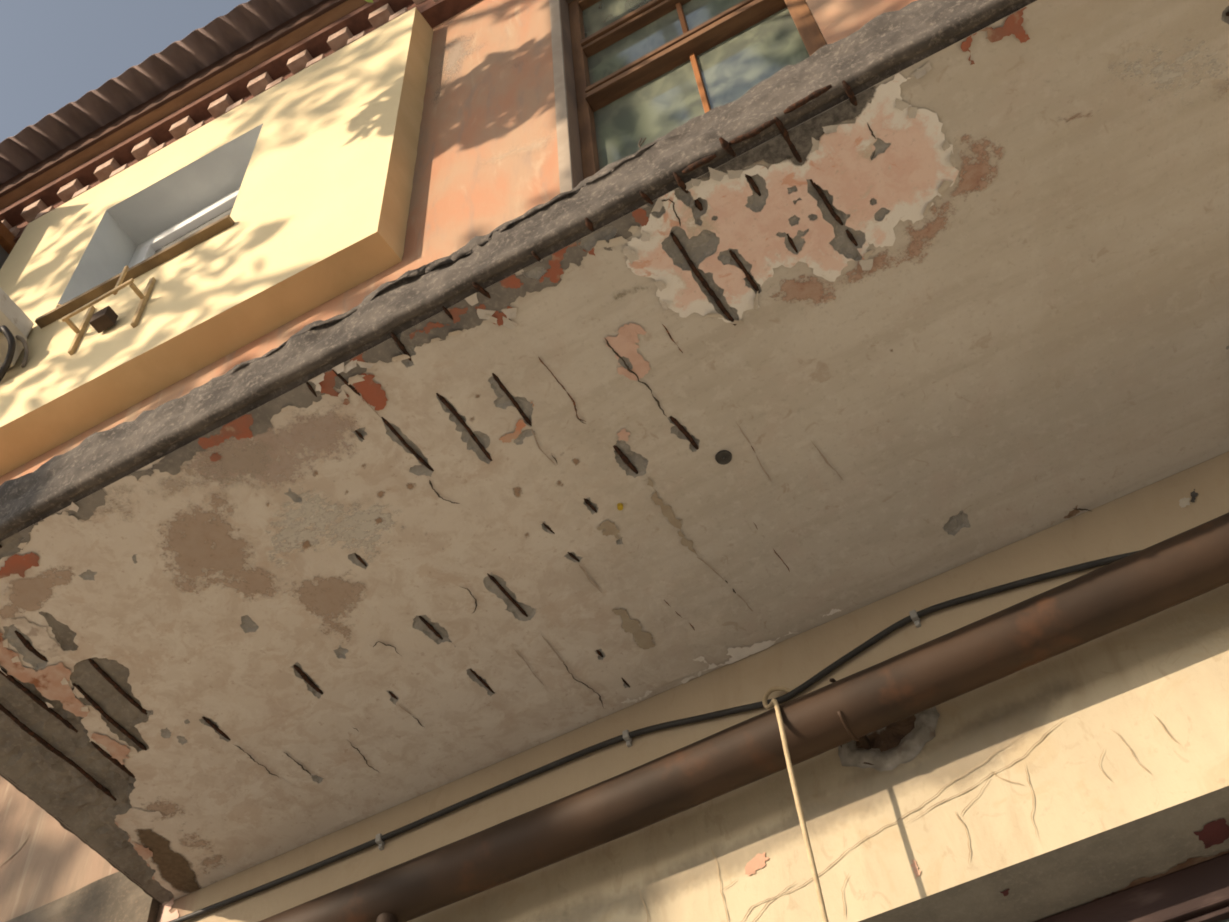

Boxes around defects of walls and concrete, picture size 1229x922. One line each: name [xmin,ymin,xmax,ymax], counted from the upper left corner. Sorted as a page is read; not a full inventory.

peeling [961,7,1030,65]
corrosion [846,135,1003,283]
peeling [128,61,959,481]
corrosion [773,275,836,304]
peeling [0,489,107,579]
spalling [483,572,536,621]
spalling [412,615,456,647]
spalling [291,662,324,699]
spalling [466,668,495,697]
spalling [160,715,231,745]
spalling [0,611,179,922]
crack [711,720,1062,922]